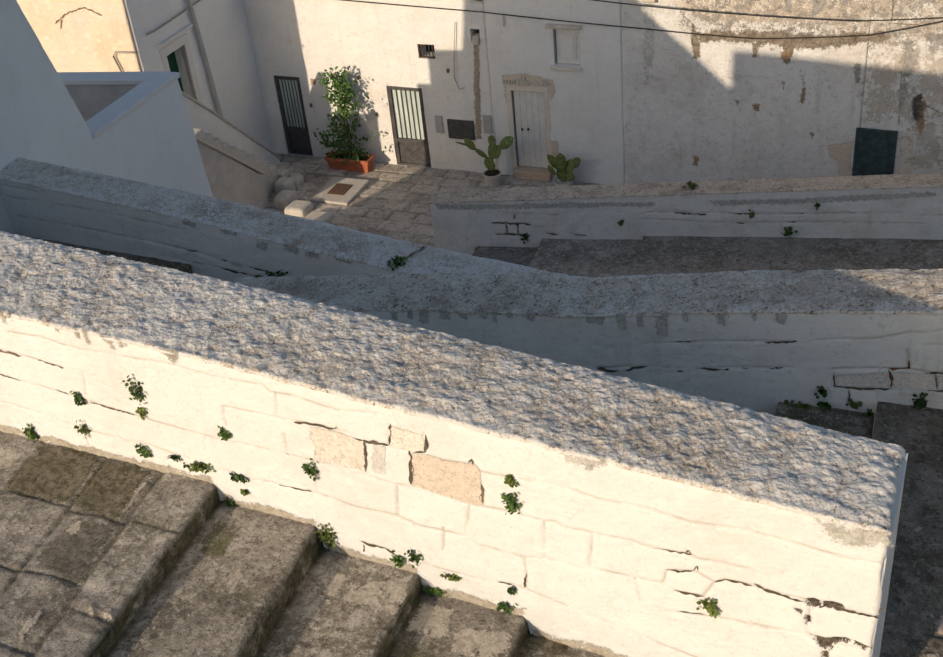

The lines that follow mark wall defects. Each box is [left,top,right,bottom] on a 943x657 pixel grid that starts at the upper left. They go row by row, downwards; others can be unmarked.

crack [55,7,101,28]
peeling [671,0,890,25]
peeling [836,372,943,389]
crack [294,422,429,484]
peeling [309,426,482,505]
crack [663,549,883,619]